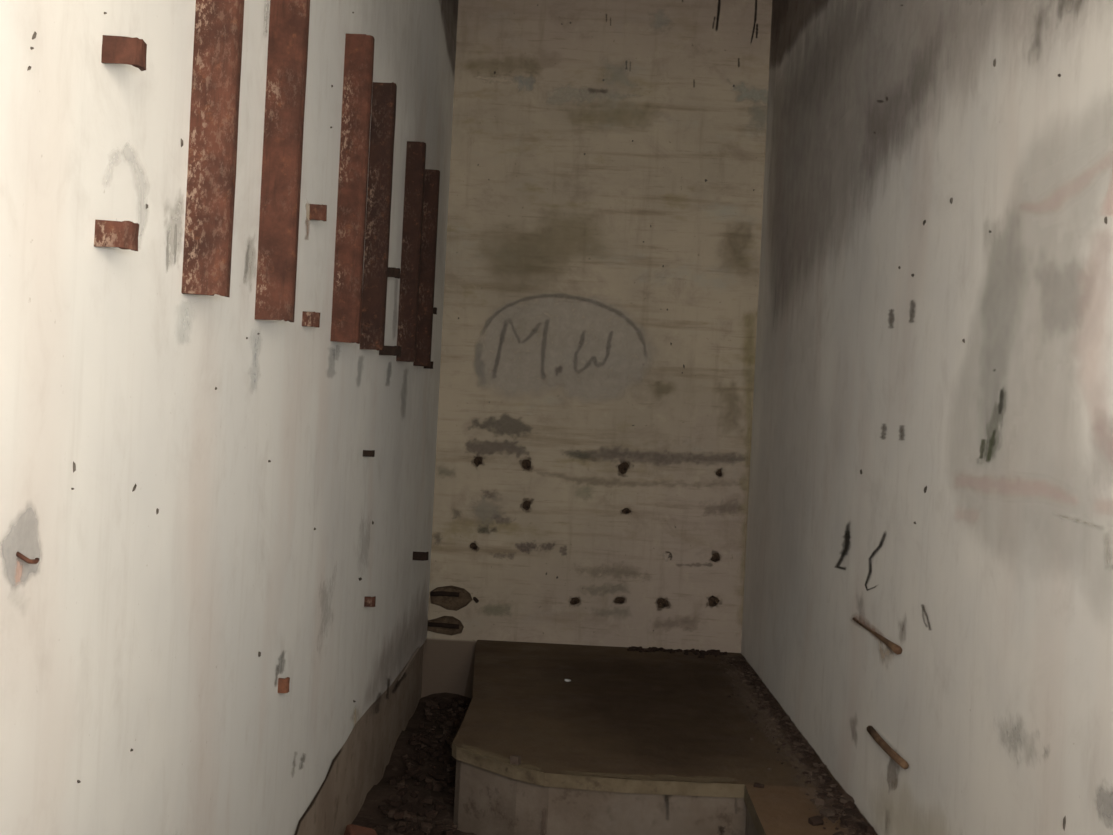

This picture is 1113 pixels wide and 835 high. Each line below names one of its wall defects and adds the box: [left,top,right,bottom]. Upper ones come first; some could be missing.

peeling [2,509,40,585]